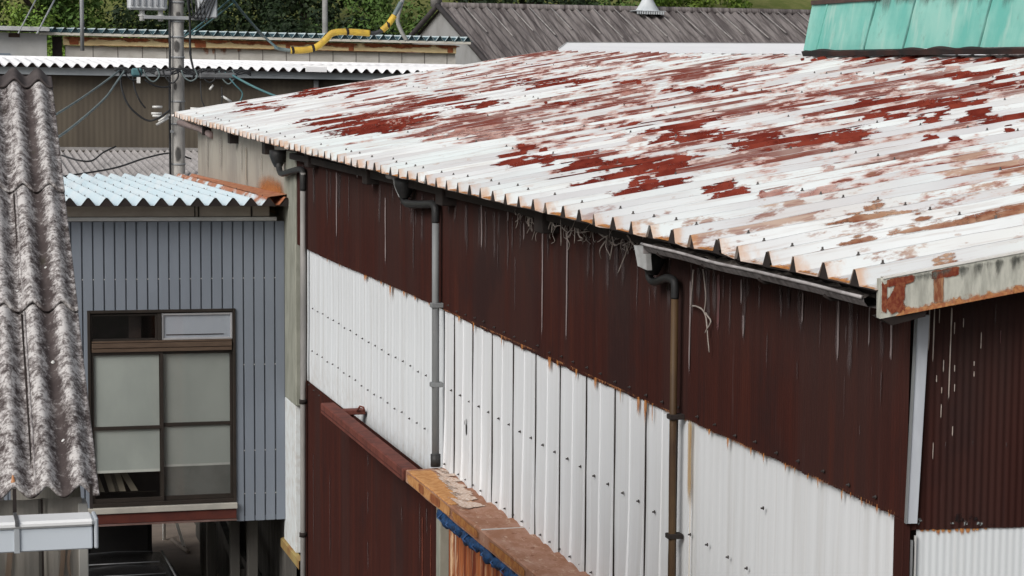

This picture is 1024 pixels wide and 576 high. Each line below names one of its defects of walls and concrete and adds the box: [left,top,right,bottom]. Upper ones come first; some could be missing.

corrosion [292,74,646,142]
corrosion [239,179,287,215]
corrosion [551,212,714,251]
corrosion [752,259,850,283]
corrosion [864,253,1024,316]
corrosion [685,419,710,497]
corrosion [407,470,478,538]
peeling [435,468,485,508]
corrosion [489,542,525,576]